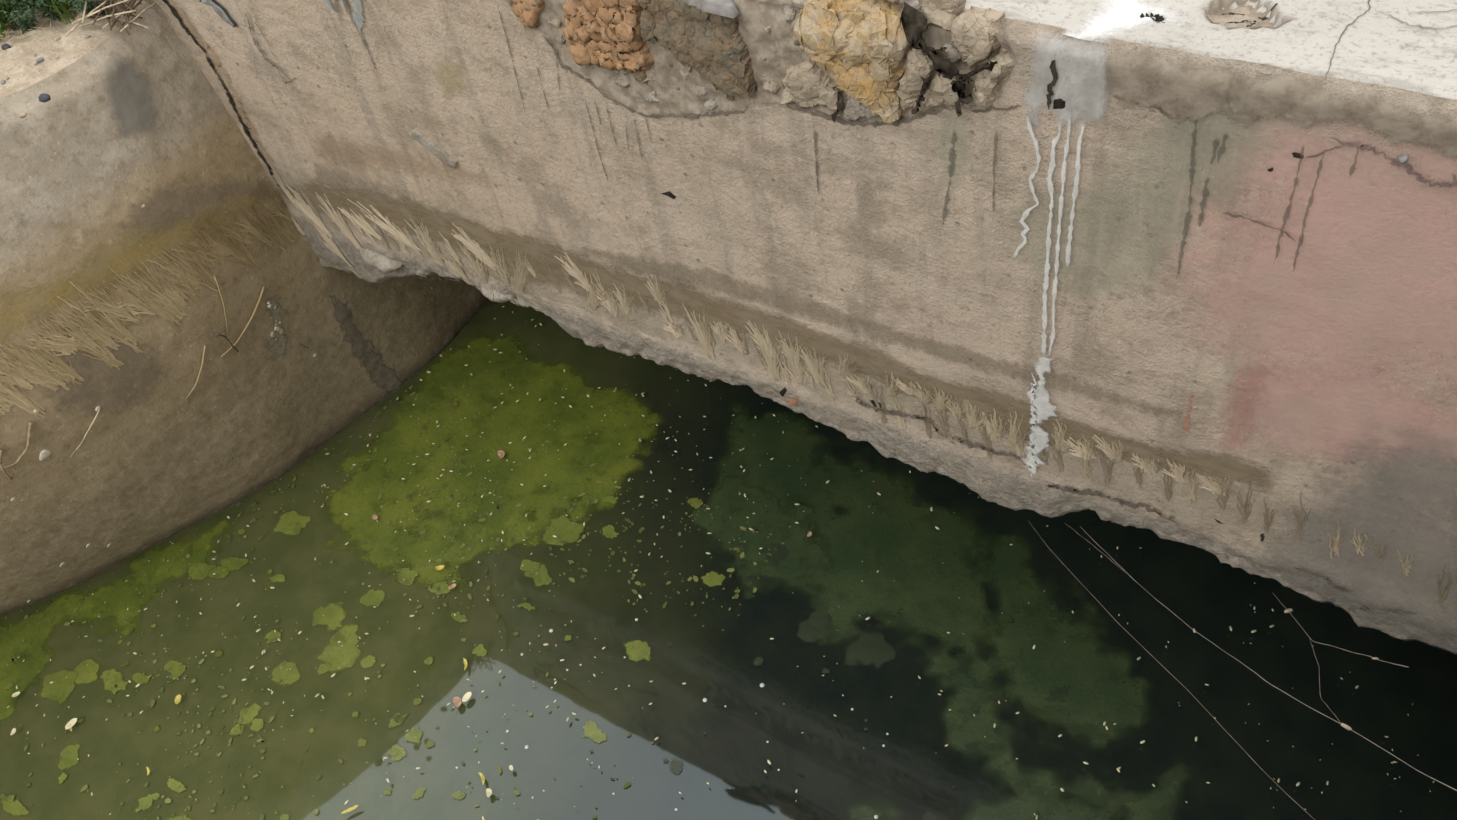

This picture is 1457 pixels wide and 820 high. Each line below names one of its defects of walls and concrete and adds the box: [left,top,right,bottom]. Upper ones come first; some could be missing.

crack [162,0,279,187]
crack [245,15,297,84]
spalling [506,0,1016,127]
crack [1325,0,1457,82]
crack [1306,138,1457,188]
water stain [0,0,1269,486]
crack [1224,213,1295,241]